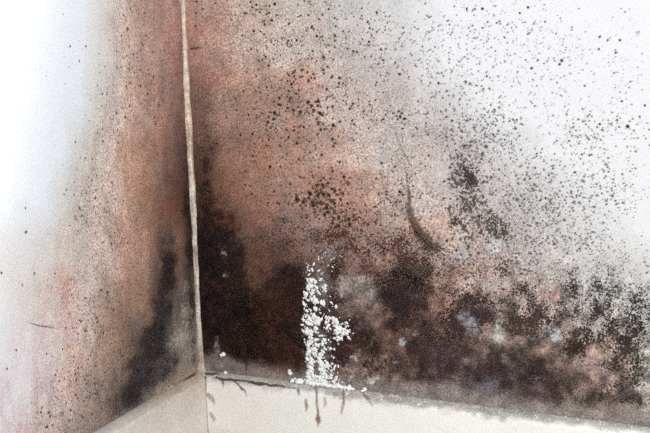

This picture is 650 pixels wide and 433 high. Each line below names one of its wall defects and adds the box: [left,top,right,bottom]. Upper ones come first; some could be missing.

water stain [414,5,517,103]
water stain [525,26,573,118]
water stain [557,103,633,160]
crack [205,364,295,392]